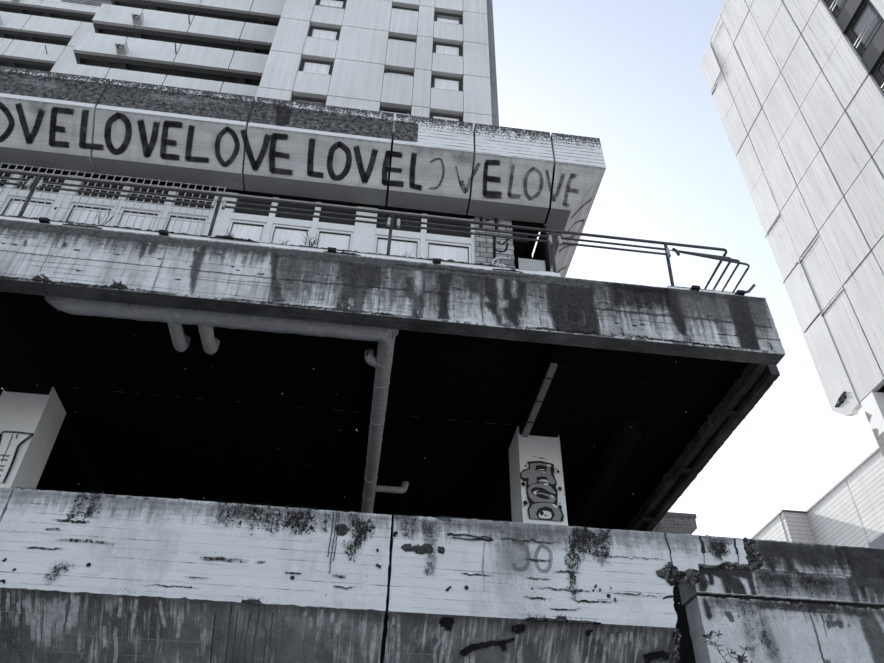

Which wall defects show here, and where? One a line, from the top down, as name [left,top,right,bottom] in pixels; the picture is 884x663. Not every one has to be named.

damp [0,219,771,350]
damp [28,490,162,550]
damp [320,511,358,589]
damp [303,612,341,633]
damp [433,632,446,663]
damp [601,633,633,663]
damp [699,540,884,663]